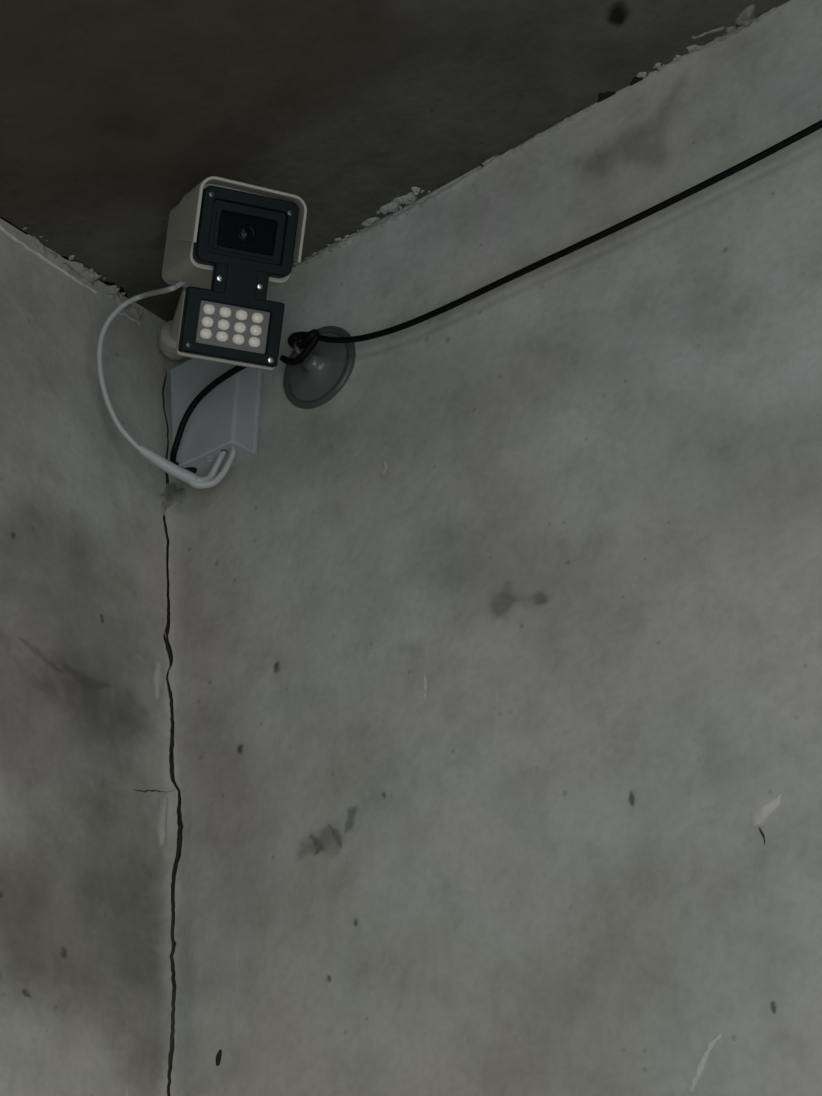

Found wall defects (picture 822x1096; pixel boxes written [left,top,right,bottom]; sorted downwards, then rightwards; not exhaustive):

peeling [0,221,143,324]
crack [161,372,169,484]
crack [134,515,184,1096]